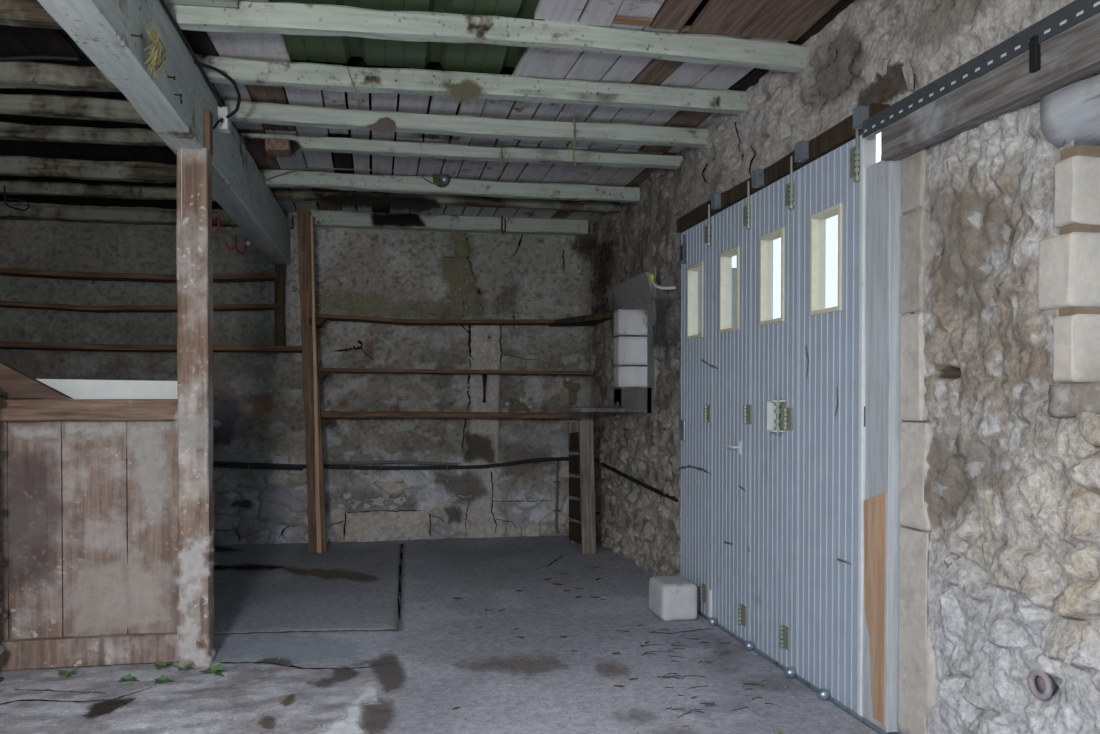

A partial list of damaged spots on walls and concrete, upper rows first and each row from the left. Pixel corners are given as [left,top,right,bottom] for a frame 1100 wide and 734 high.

damp [213,398,238,444]
crack [329,232,552,537]
damp [435,434,549,523]
damp [305,655,404,734]